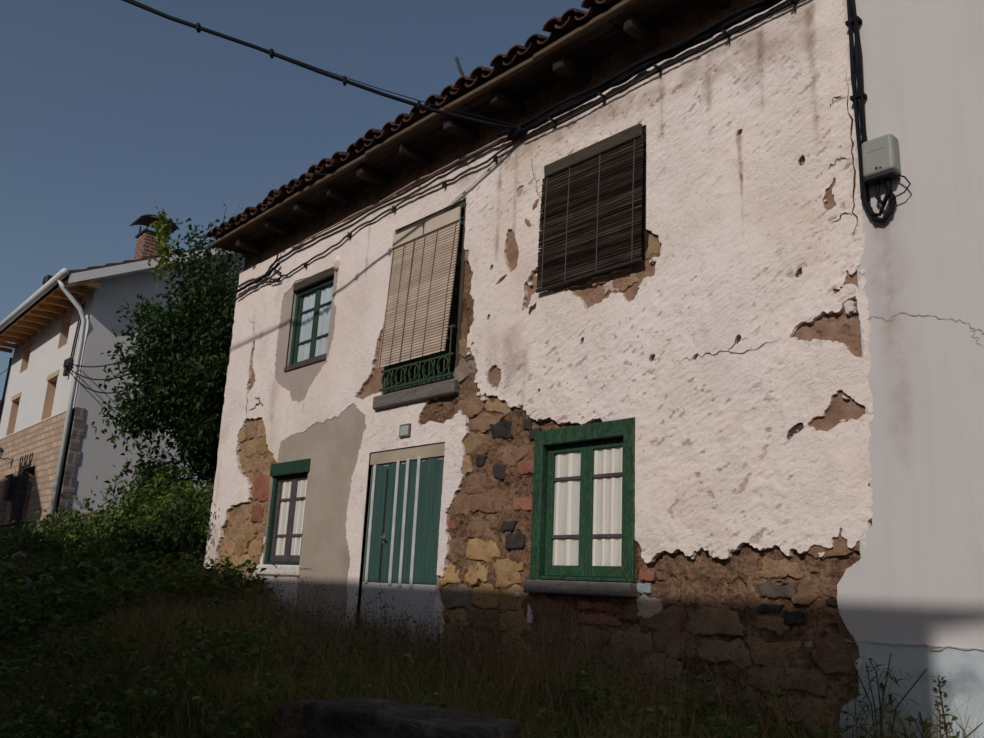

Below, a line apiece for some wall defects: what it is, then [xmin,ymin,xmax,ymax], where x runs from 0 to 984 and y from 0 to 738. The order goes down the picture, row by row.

peeling [824,178,836,210]
peeling [501,229,519,281]
peeling [523,231,662,314]
peeling [358,316,390,400]
crack [672,336,785,363]
crack [867,312,984,345]
peeling [217,418,278,581]
flaking render [420,250,984,738]